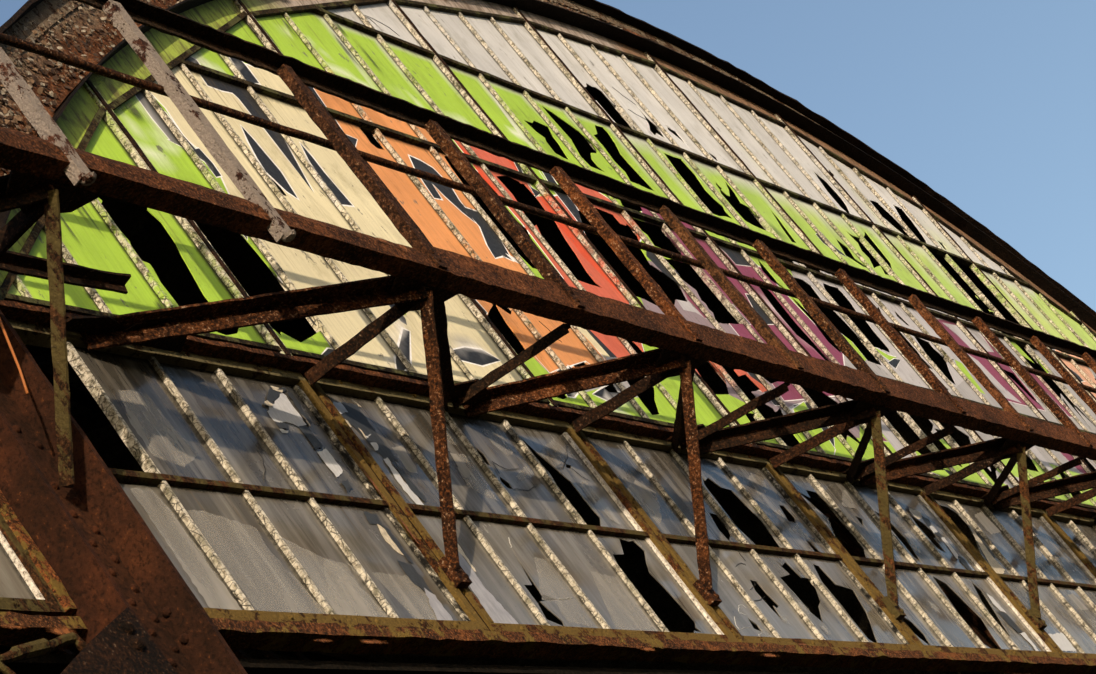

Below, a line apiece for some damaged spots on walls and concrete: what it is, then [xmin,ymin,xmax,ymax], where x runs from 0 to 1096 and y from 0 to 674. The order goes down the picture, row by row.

corrosion [0,81,35,134]
corrosion [1,0,124,117]
peeling [264,386,353,492]
peeling [333,401,426,505]
peeling [364,511,453,620]
corrosion [52,627,73,635]